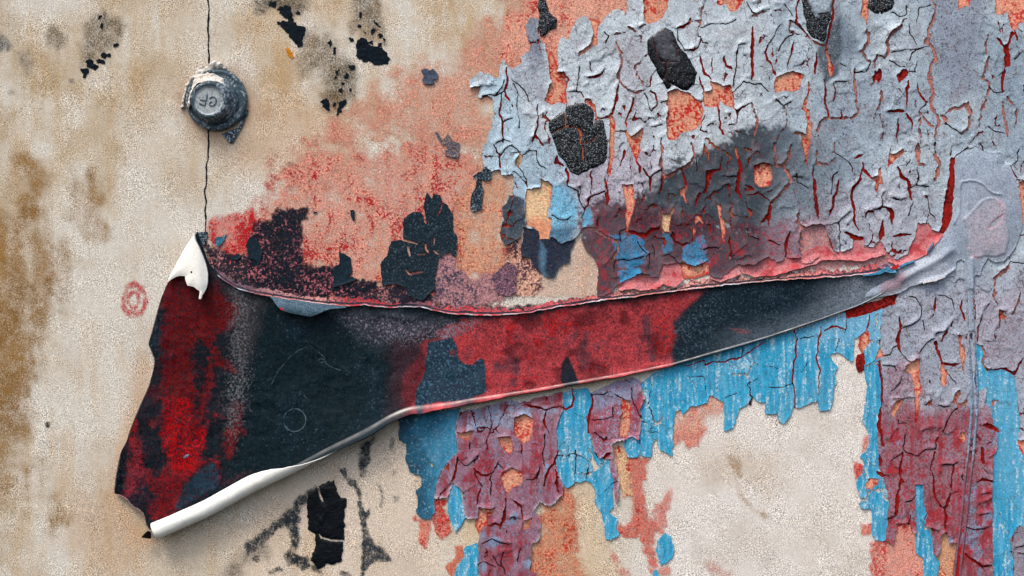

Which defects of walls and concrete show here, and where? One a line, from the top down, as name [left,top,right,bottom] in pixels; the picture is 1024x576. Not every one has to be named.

crack [204,0,212,64]
crack [498,67,539,143]
crack [568,32,658,119]
crack [643,26,769,199]
crack [787,0,940,241]
crack [203,130,211,232]
peeling [380,193,457,300]
crack [565,167,660,265]
peeling [469,0,1024,576]
peeling [114,232,973,576]
crack [524,389,594,487]
crack [877,360,951,529]